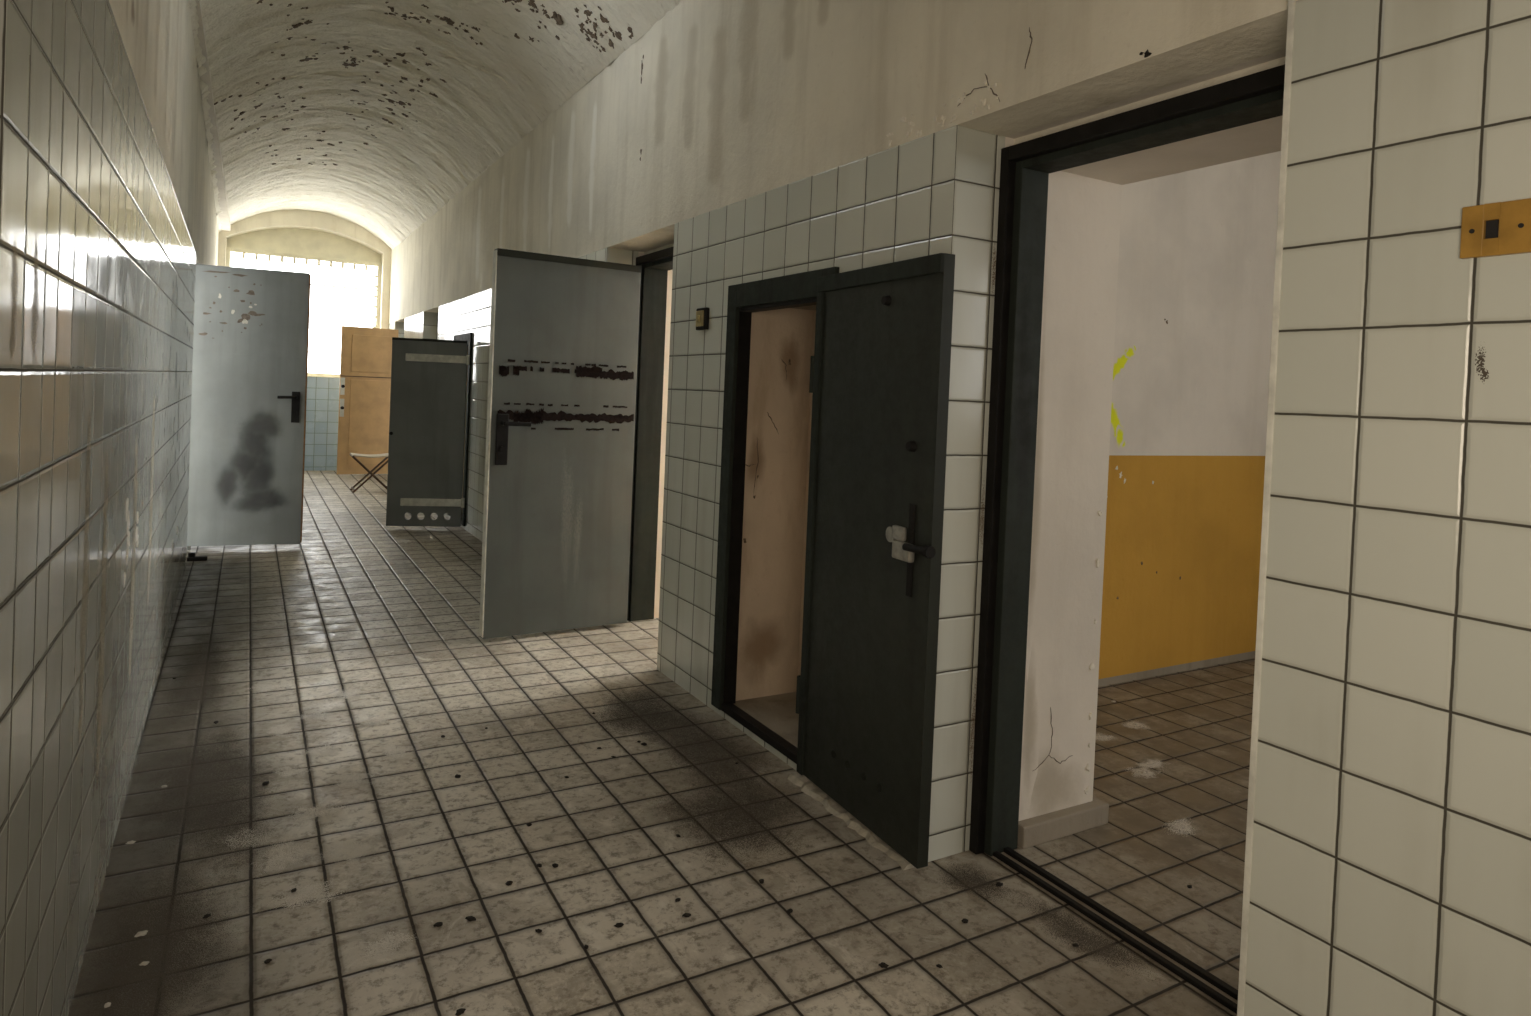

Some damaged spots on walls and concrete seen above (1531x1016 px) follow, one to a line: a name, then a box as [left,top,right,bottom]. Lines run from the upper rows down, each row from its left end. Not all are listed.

peeling [214,0,447,166]
peeling [384,2,483,45]
peeling [502,0,634,52]
damp [650,0,832,193]
damp [475,95,598,284]
crack [1033,707,1073,771]